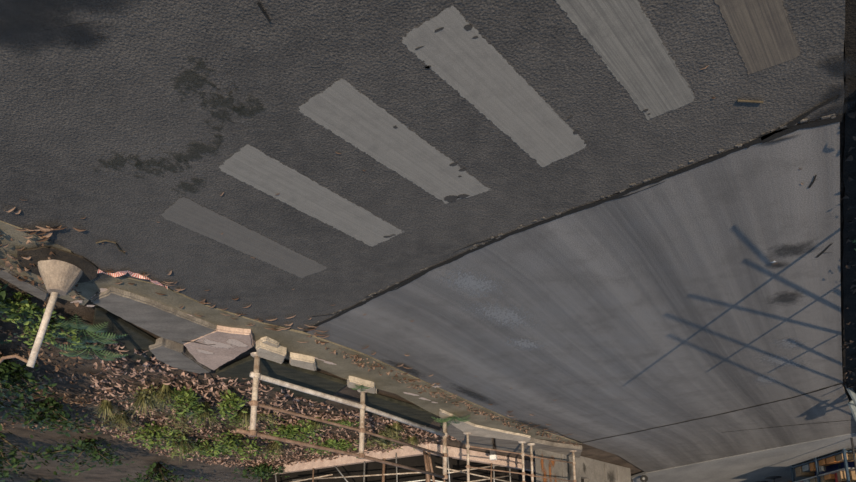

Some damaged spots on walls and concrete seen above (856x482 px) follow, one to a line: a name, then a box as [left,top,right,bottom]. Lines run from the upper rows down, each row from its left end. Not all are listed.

damp [773,245,805,267]